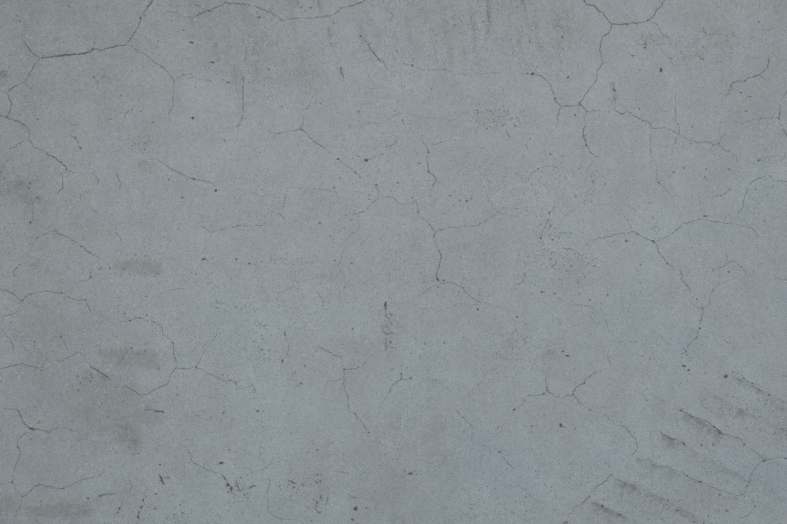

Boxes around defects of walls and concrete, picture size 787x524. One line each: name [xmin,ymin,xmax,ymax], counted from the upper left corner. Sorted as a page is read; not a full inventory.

crack [25,0,153,69]
crack [578,0,667,154]